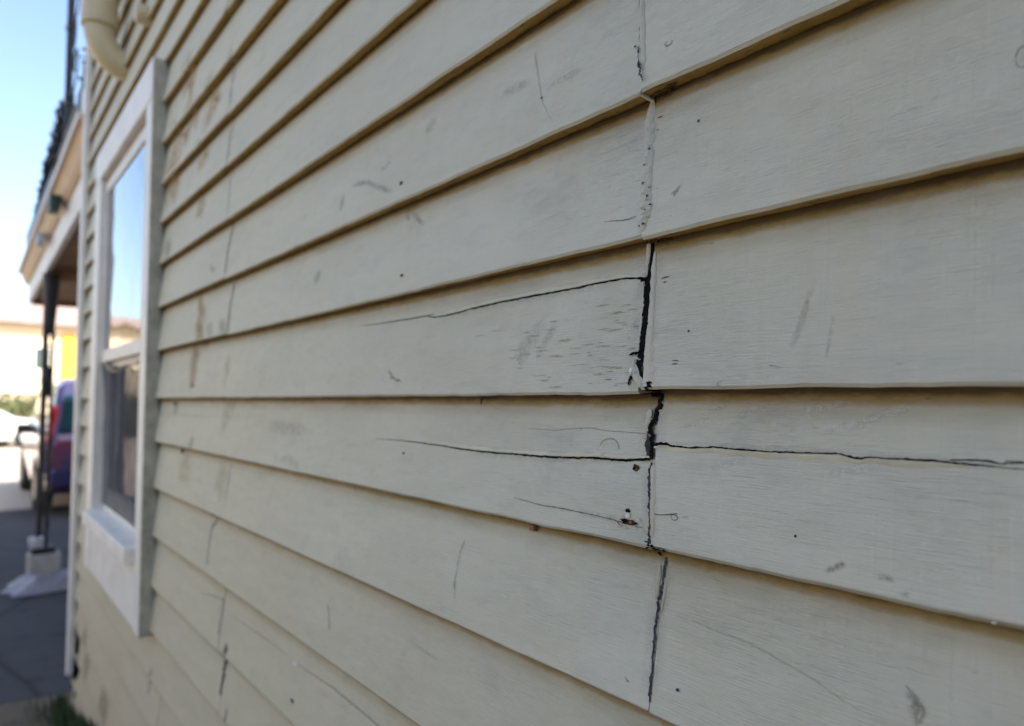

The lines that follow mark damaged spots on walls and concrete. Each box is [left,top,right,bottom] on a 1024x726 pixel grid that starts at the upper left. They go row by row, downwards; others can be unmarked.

crack [636,47,644,81]
crack [361,216,1024,703]